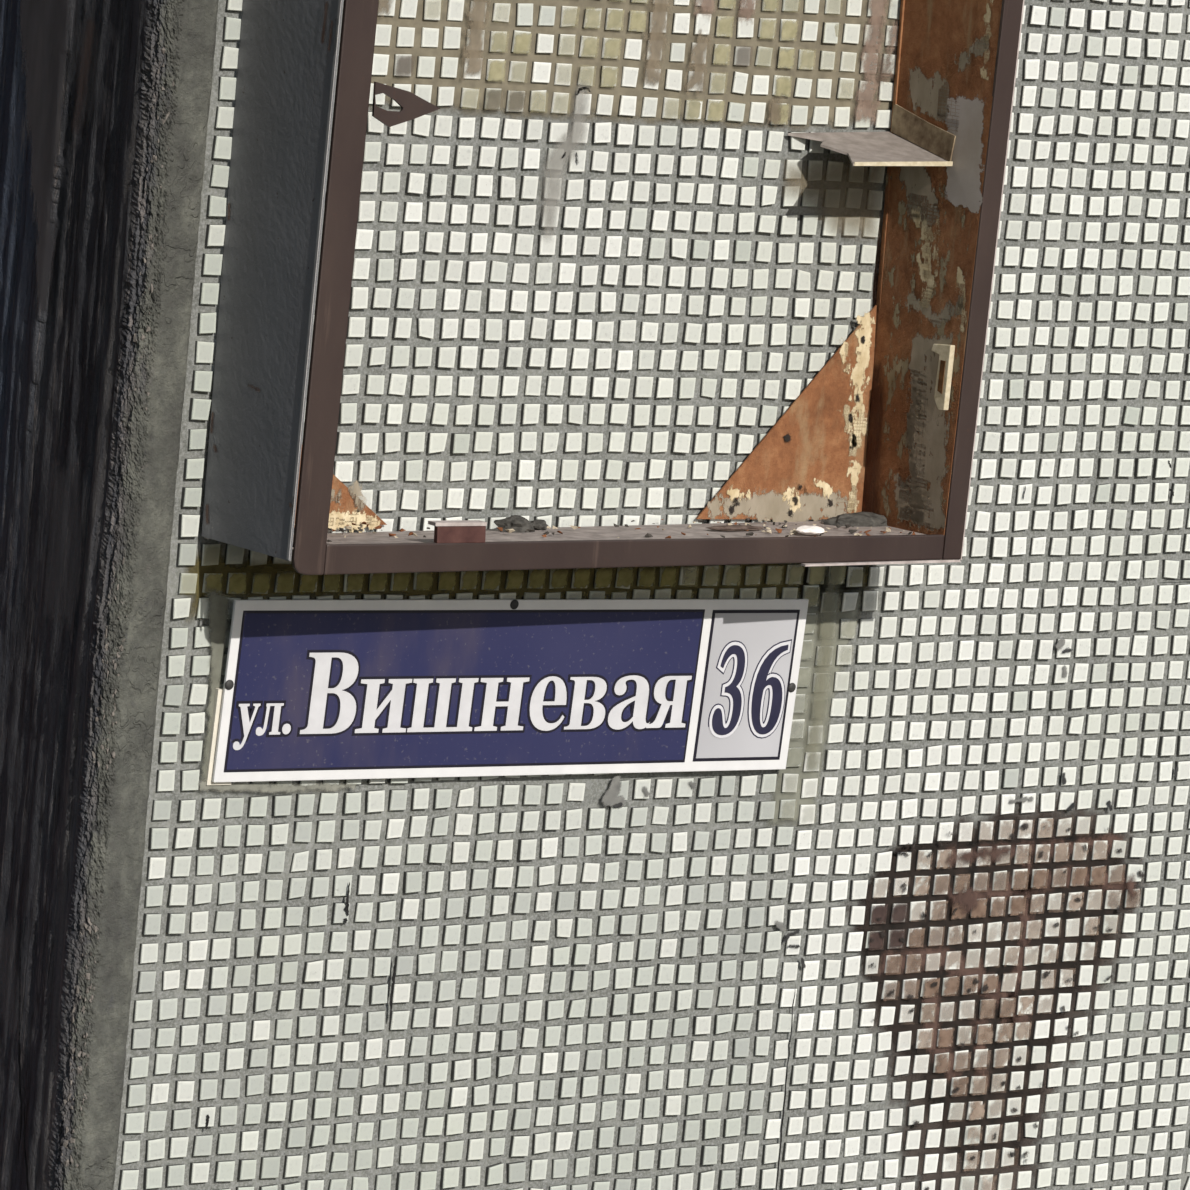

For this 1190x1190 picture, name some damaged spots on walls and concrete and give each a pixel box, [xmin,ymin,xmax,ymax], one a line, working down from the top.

rust [872,226,880,303]
rust [862,365,882,514]
crack [776,984,796,1190]
rust [854,798,1145,1190]